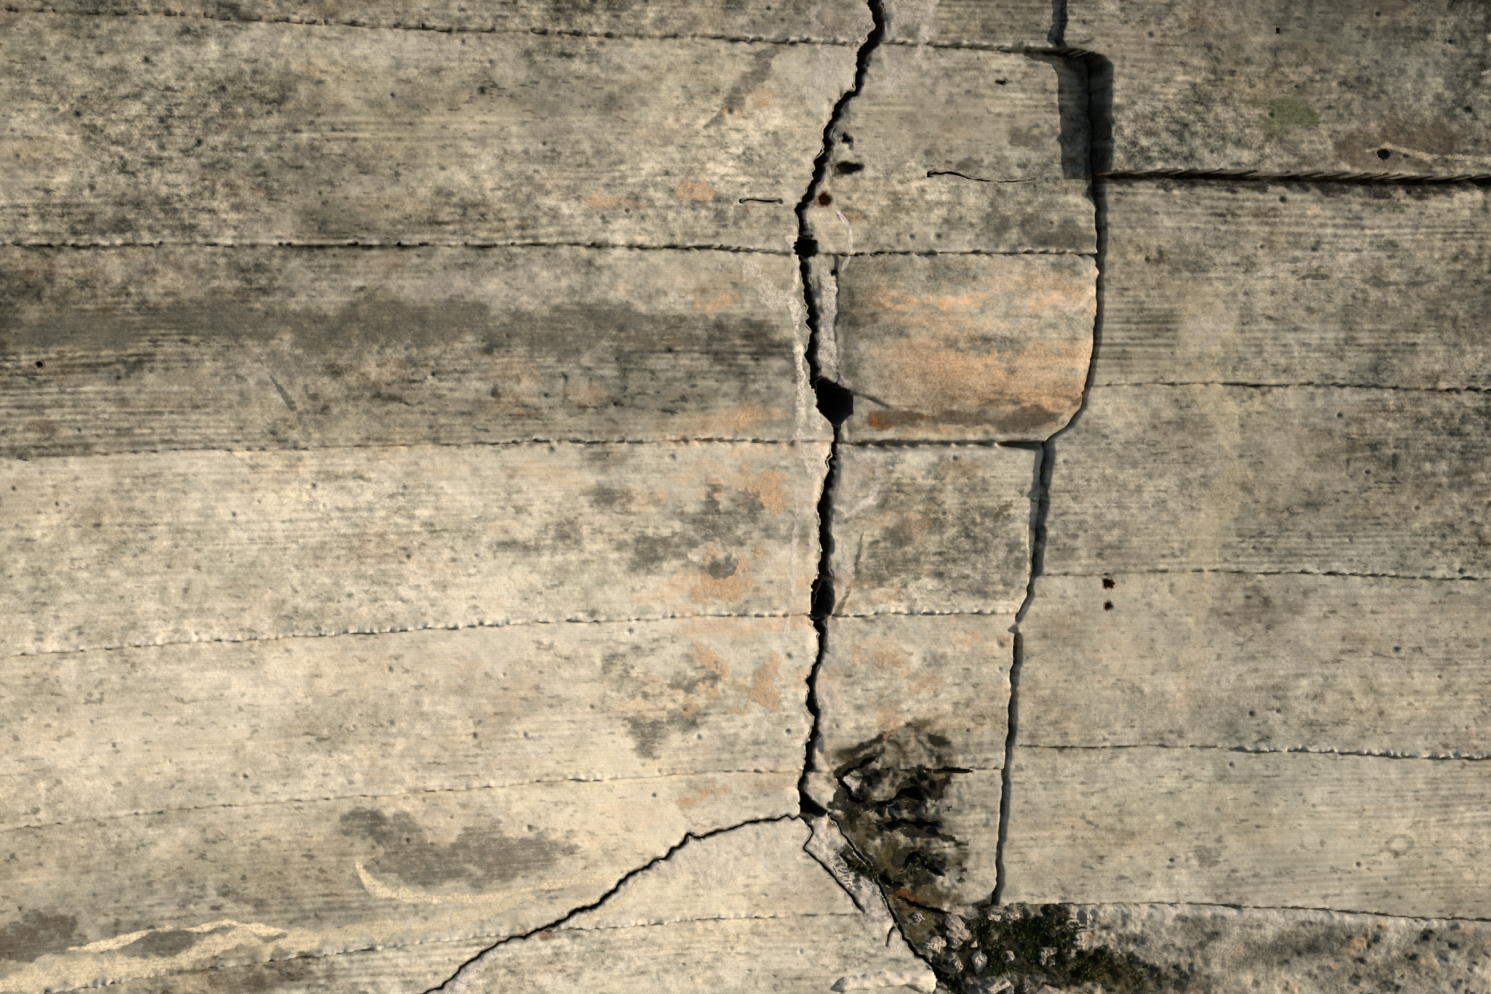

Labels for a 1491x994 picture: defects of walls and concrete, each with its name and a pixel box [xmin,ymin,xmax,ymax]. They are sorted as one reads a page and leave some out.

crack [927,170,1034,184]
crack [419,0,970,994]
leakage [805,822,901,956]
leakage [926,903,1161,994]